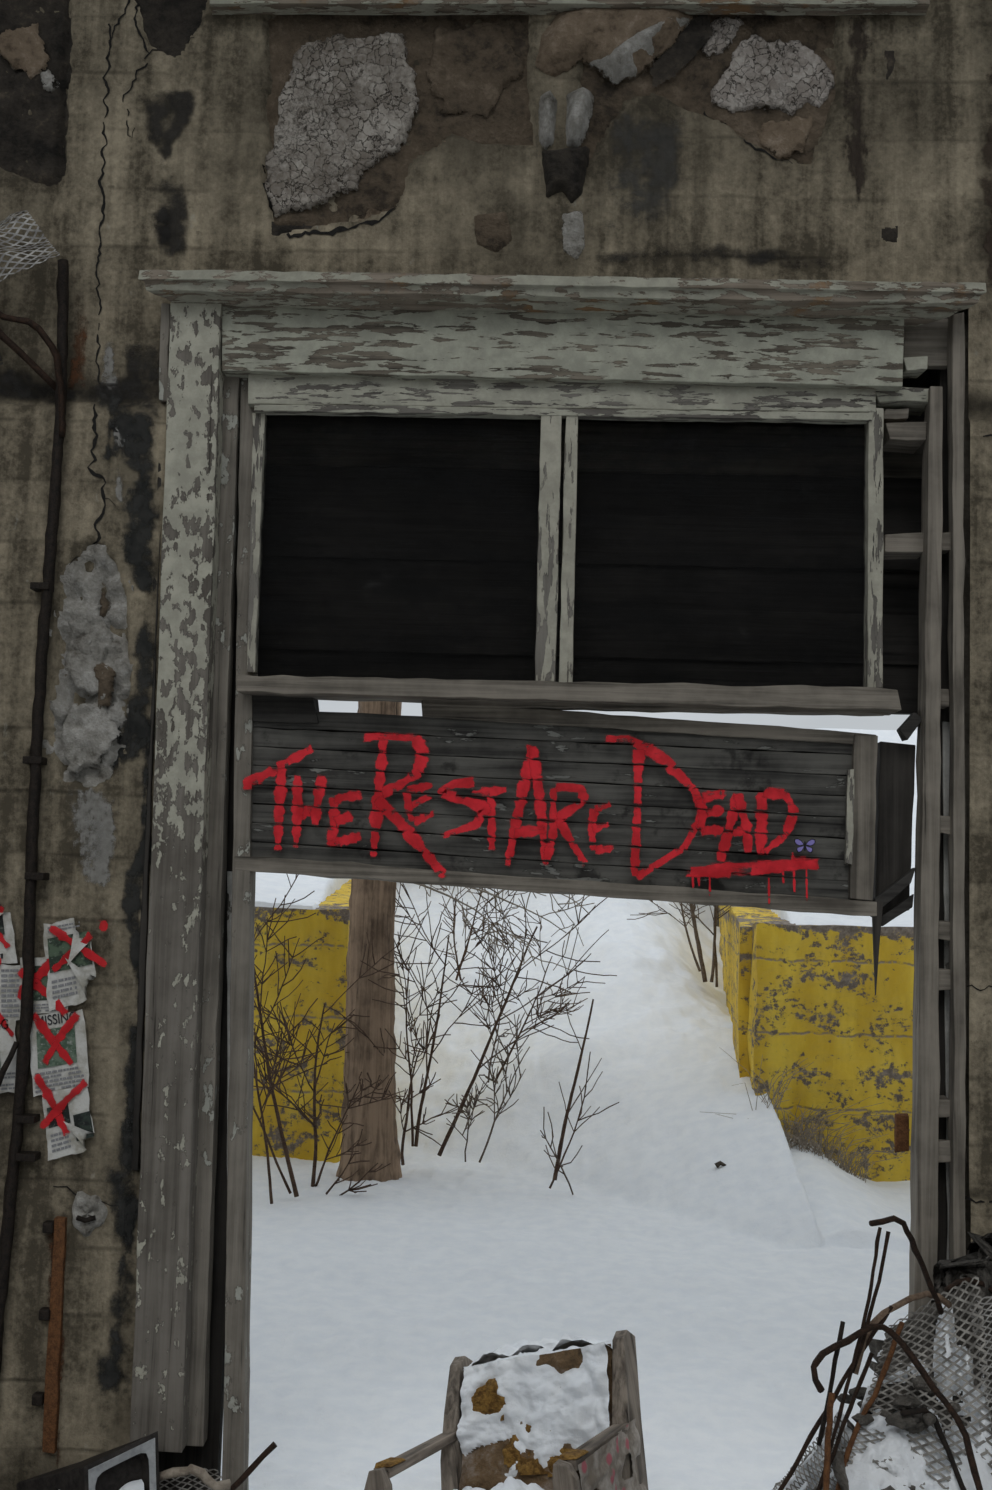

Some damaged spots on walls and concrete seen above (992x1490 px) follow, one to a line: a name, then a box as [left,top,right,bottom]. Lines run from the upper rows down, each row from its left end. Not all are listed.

spalling [0,0,73,187]
spalling [135,0,207,58]
spalling [265,14,533,236]
spalling [578,15,836,164]
crack [69,0,194,565]
spalling [42,544,134,787]